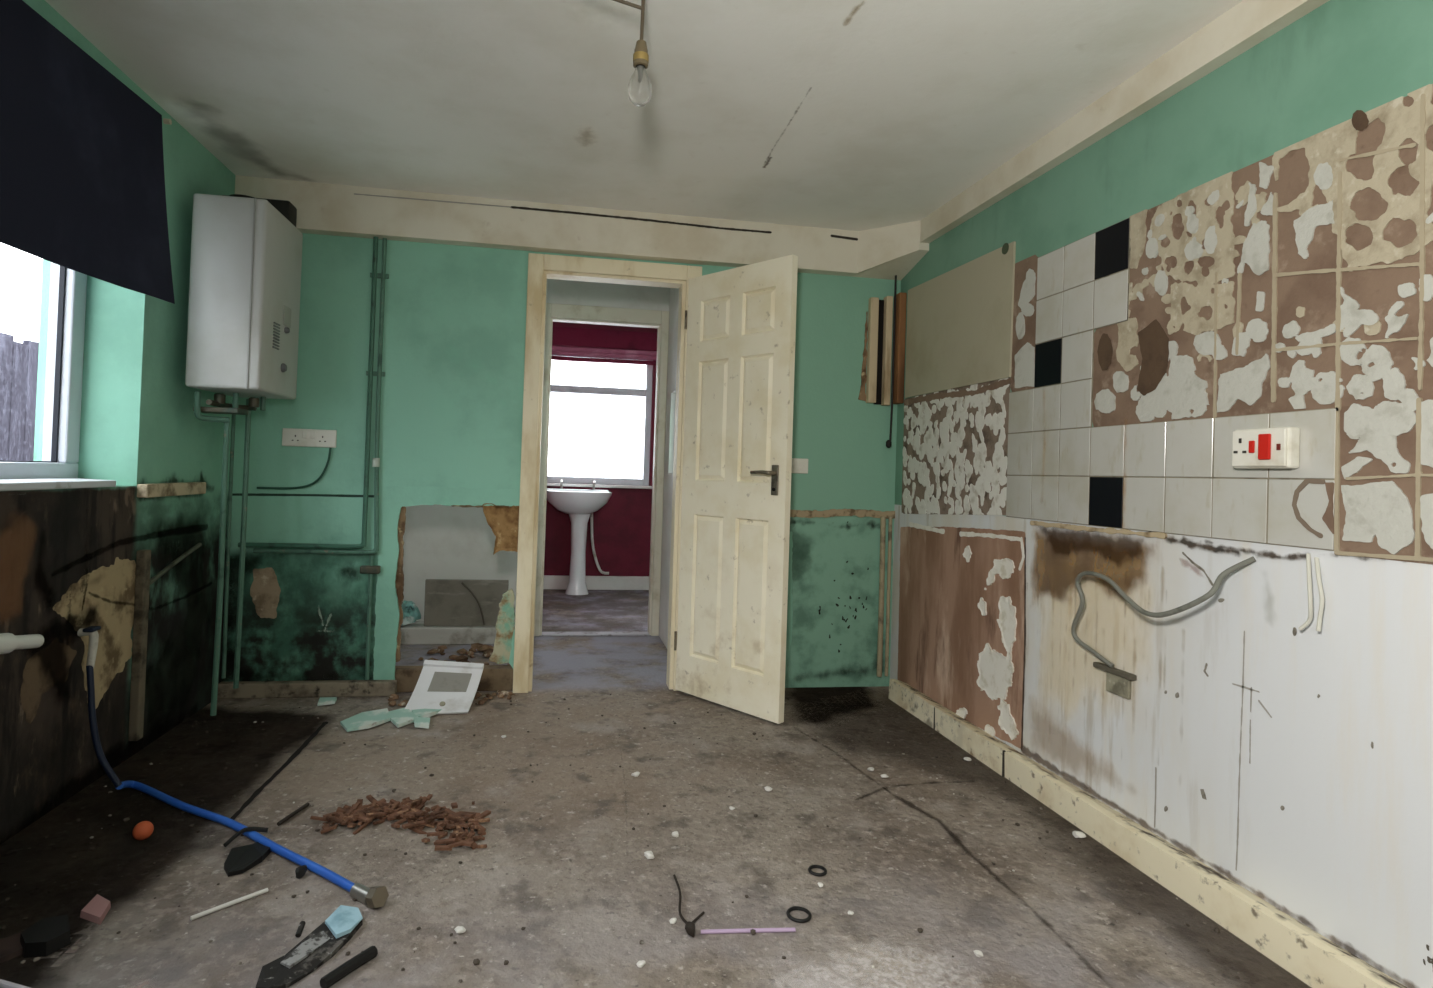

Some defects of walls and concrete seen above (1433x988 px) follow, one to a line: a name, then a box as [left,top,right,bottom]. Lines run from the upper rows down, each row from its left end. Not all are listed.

peeling [1092,84,1433,565]
flaking render [0,528,33,617]
flaking render [20,557,136,724]
spalling [395,506,406,662]
water stain [790,509,895,528]
water stain [818,580,867,653]
flaking render [898,255,1038,751]
water stain [1030,521,1306,598]
water stain [0,517,328,988]